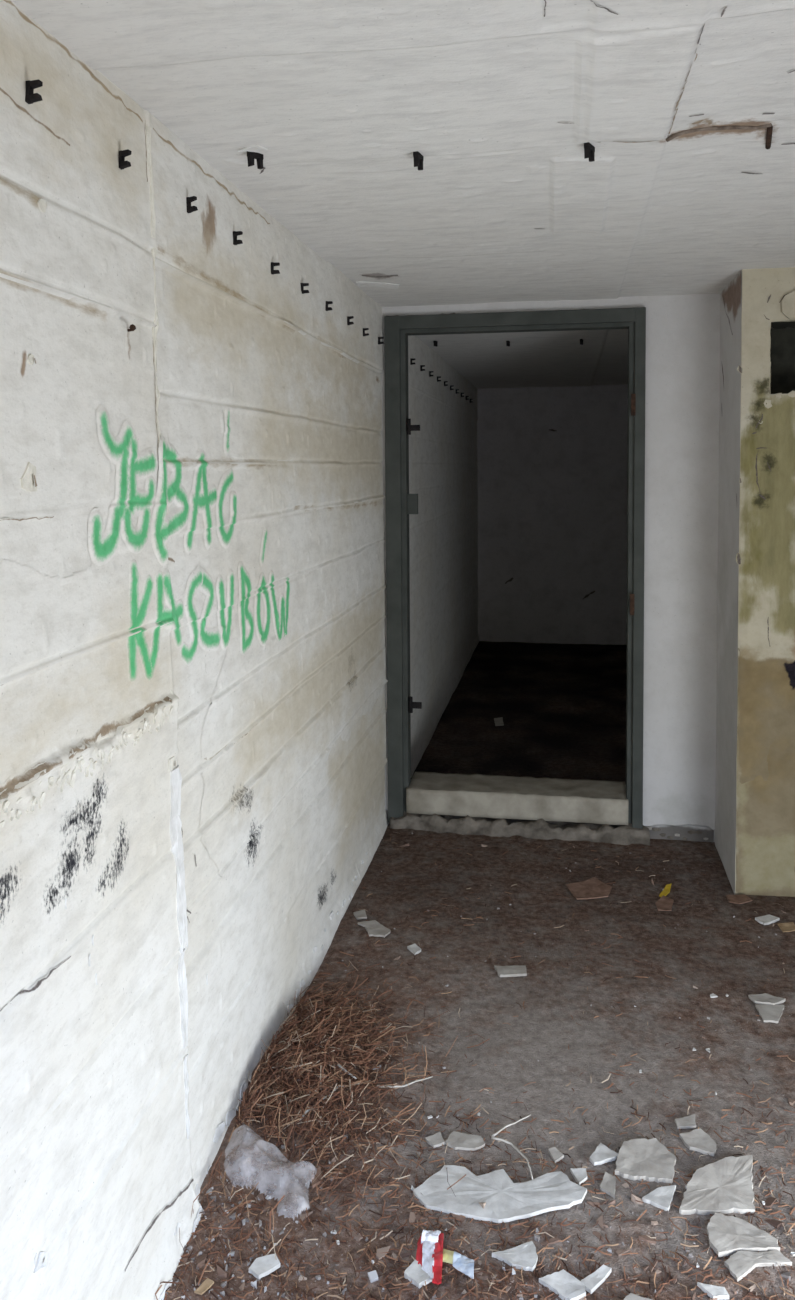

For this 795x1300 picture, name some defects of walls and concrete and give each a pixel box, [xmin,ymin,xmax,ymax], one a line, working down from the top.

crack [591,0,618,15]
crack [613,7,728,143]
spalling [764,290,795,320]
damp [0,0,389,946]
spalling [759,391,795,424]
damp [643,362,795,892]
spalling [0,704,173,836]
crack [125,1178,194,1272]